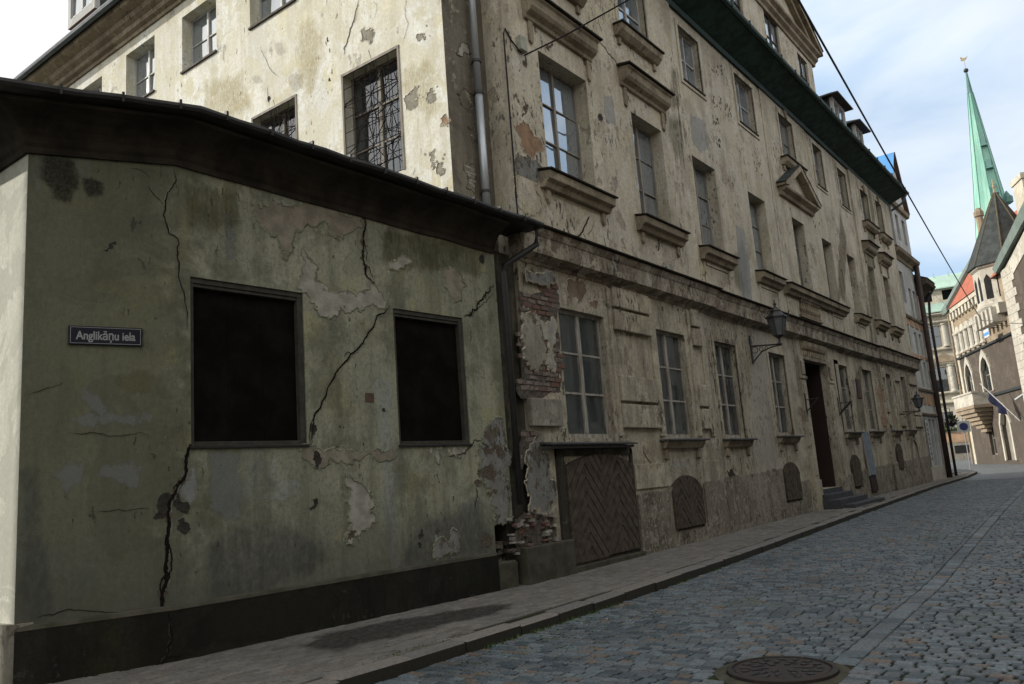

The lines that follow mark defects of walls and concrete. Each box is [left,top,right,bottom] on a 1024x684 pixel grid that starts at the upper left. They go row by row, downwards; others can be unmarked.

crack [343,0,377,54]
mould [43,157,101,201]
peeling [511,103,544,217]
crack [132,168,190,325]
peeling [249,196,390,320]
crack [309,217,390,445]
crack [464,285,494,317]
flaking render [515,269,603,399]
crack [98,444,192,664]
spalling [310,423,322,469]
peeling [343,471,380,546]
peeling [429,416,559,563]